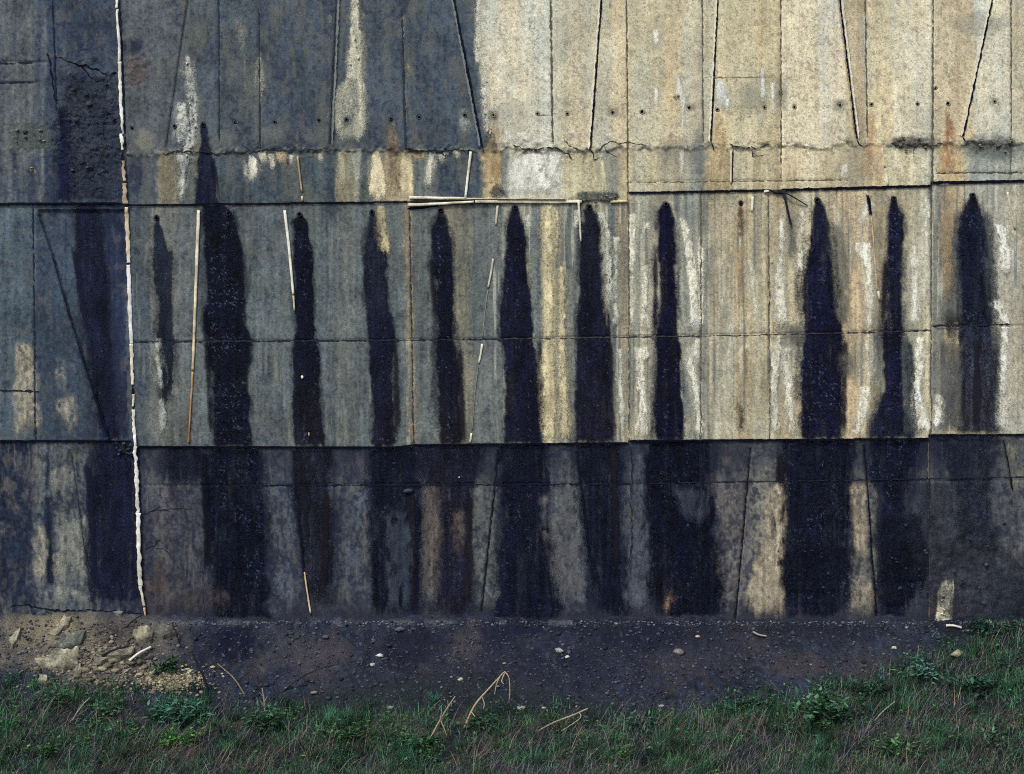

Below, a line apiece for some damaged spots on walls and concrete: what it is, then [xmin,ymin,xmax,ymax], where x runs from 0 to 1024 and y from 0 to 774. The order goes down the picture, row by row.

crack [47,53,119,139]
water stain [36,106,143,601]
water stain [149,220,177,430]
water stain [159,56,274,617]
water stain [244,152,295,178]
water stain [290,216,339,603]
water stain [334,0,727,619]
crack [513,141,646,160]
water stain [746,196,1023,616]